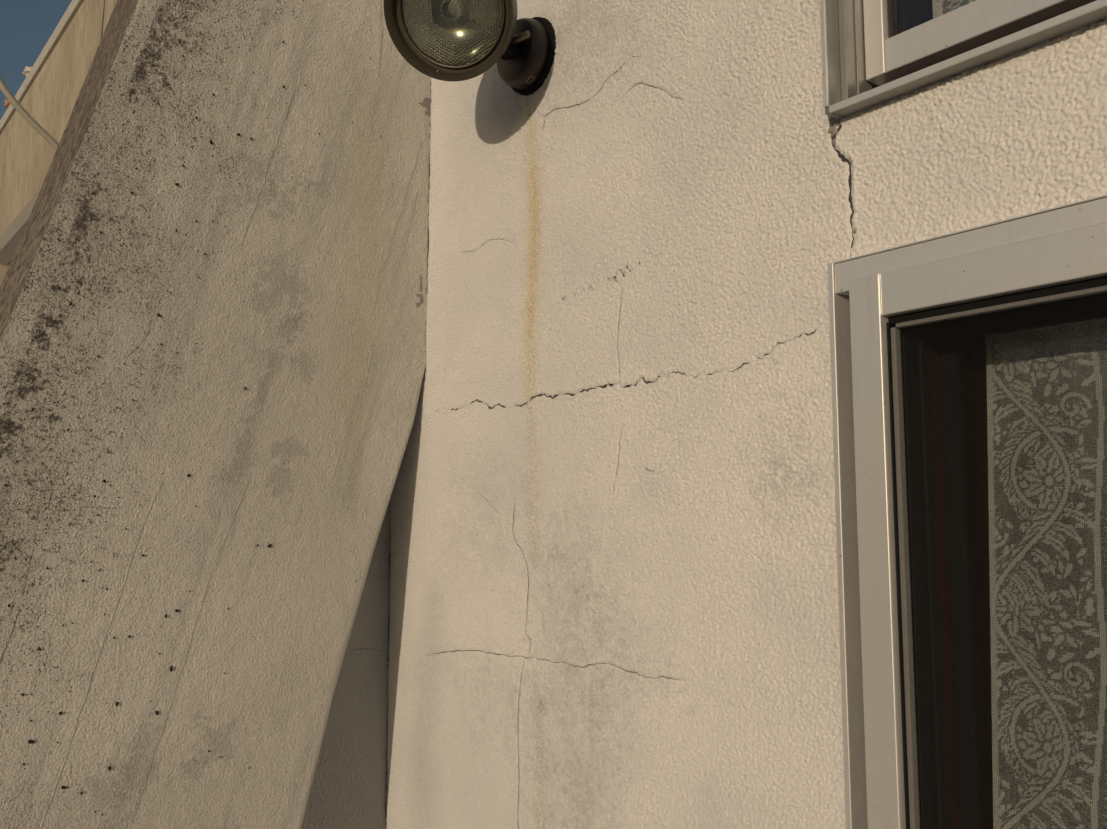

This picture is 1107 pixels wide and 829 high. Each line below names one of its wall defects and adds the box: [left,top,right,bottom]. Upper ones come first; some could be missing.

mould [126,0,197,113]
crack [831,124,854,255]
mould [0,175,116,464]
crack [436,302,826,412]
crack [430,492,685,721]